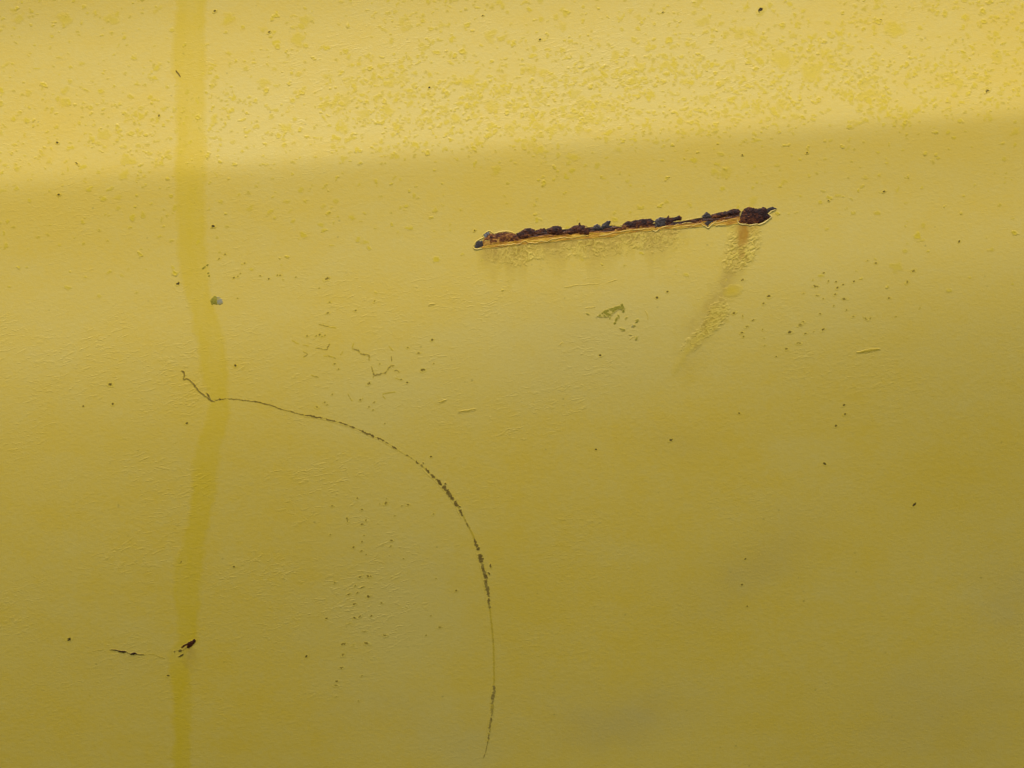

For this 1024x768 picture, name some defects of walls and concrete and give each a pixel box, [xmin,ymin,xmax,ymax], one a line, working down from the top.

rust [483,222,590,246]
crack [180,323,496,759]